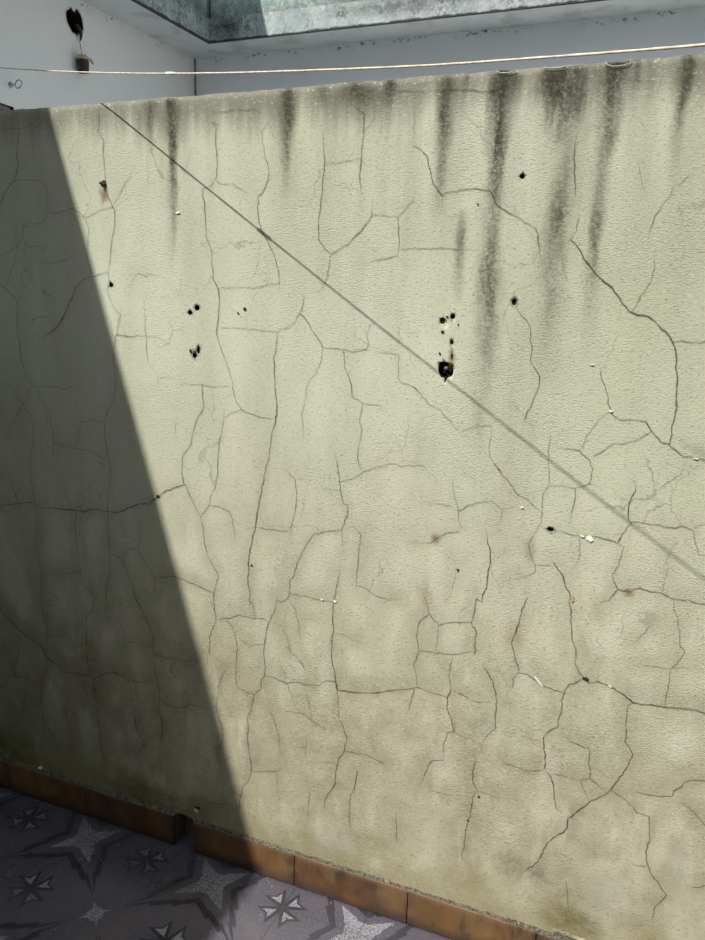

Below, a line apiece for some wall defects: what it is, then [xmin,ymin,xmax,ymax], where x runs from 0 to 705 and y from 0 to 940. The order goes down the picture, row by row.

leakage [166,98,176,185]
leakage [283,88,293,148]
leakage [440,75,451,136]
leakage [490,70,517,194]
leakage [542,65,583,110]
leakage [606,61,624,142]
leakage [679,55,694,110]
crack [318,157,461,274]
crack [415,146,539,246]
crack [571,240,705,460]
crack [0,301,497,810]
crack [511,565,703,868]